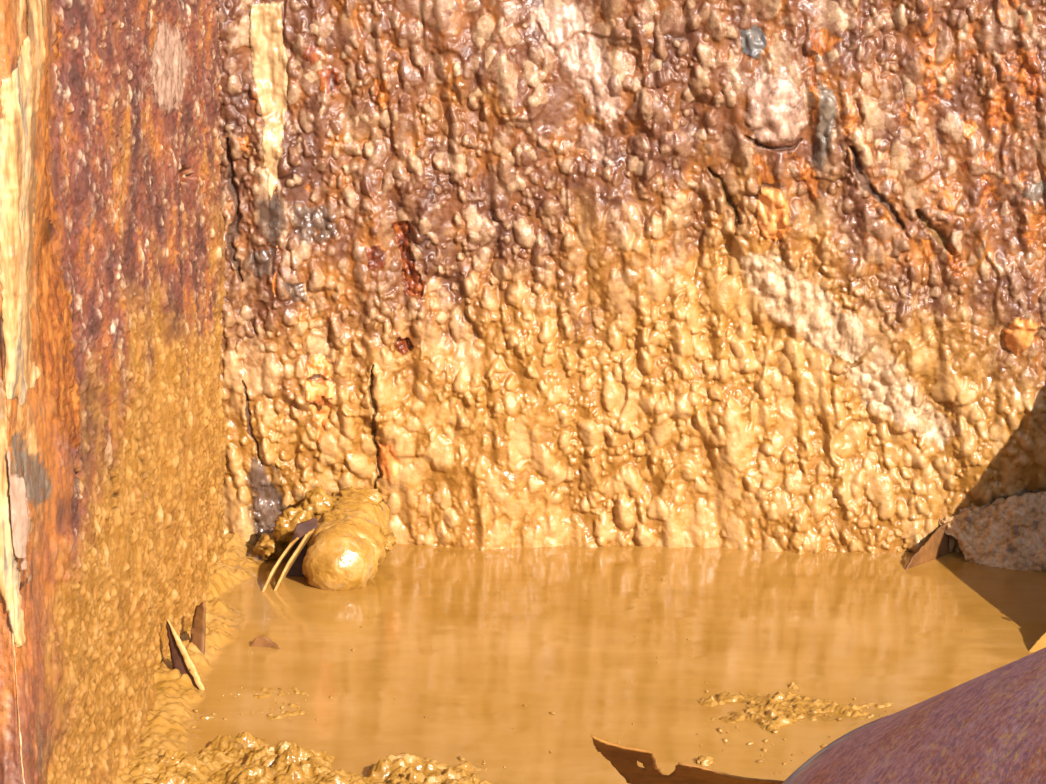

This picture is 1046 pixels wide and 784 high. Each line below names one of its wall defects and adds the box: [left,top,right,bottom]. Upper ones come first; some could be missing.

corrosion [304,45,340,93]
corrosion [374,78,389,110]
corrosion [807,28,842,126]
corrosion [237,136,250,152]
corrosion [752,153,782,187]
corrosion [792,152,819,201]
crack [850,146,947,249]
corrosion [962,119,978,141]
corrosion [960,150,995,173]
corrosion [36,15,82,454]
corrosion [920,238,964,281]